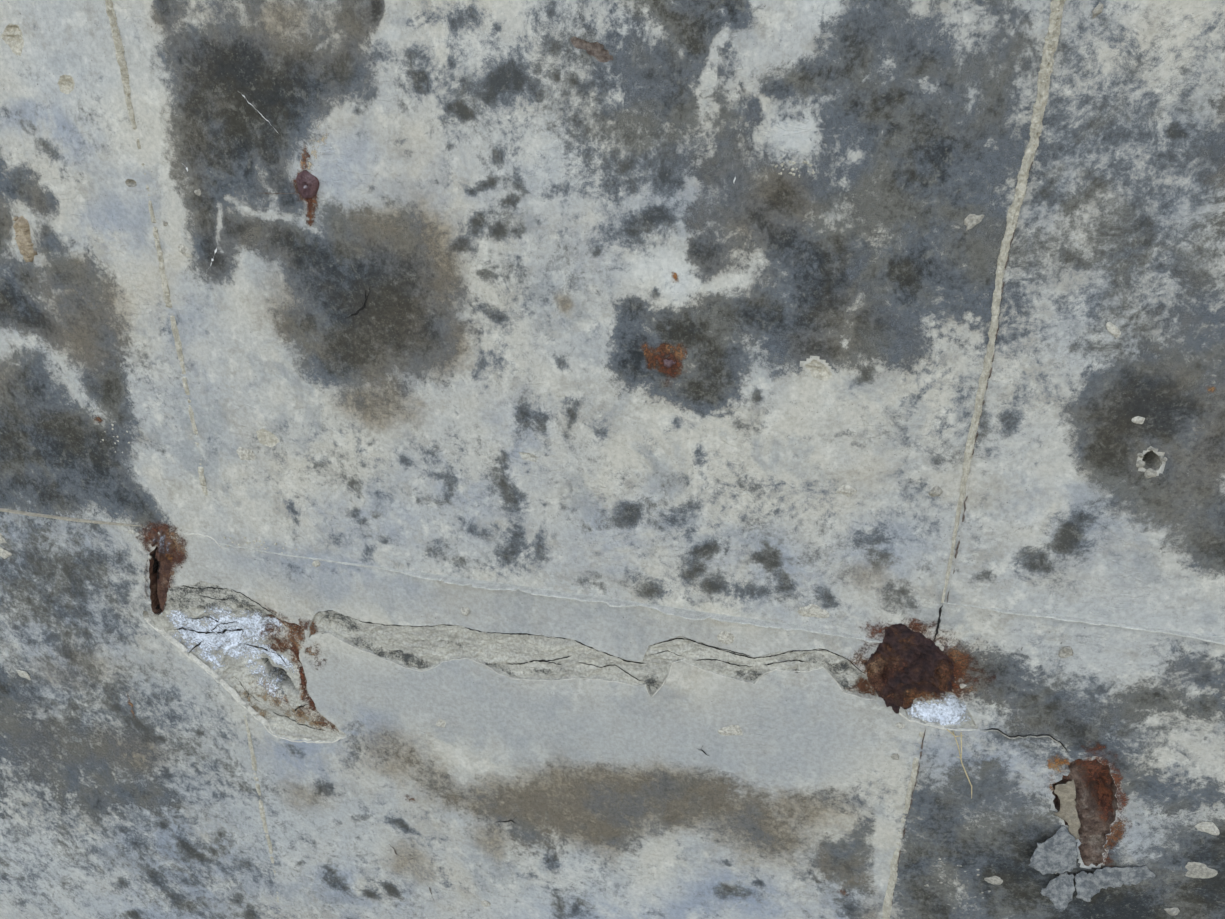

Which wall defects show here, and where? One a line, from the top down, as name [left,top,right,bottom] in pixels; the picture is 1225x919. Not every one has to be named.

rust [290,146,319,226]
water stain [151,0,481,416]
water stain [595,0,1054,417]
water stain [0,158,173,533]
rust [642,343,687,388]
water stain [1063,270,1225,576]
spalling [128,521,881,744]
rust [850,619,996,714]
water stain [367,744,875,895]
spalling [898,690,1156,912]
water stain [892,641,1225,919]